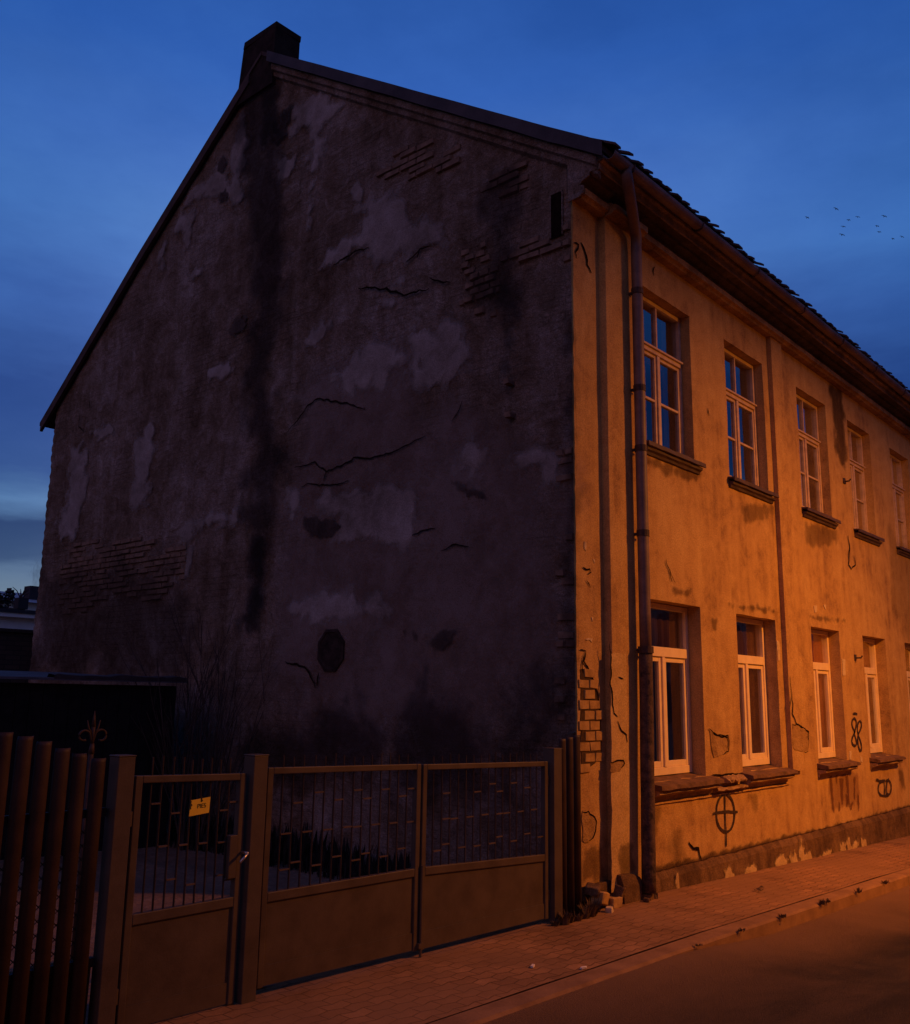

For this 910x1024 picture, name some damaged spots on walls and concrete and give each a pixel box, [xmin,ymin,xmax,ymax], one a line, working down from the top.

crack [574,242,592,273]
crack [358,278,450,296]
crack [288,398,365,431]
crack [294,436,425,487]
crack [285,661,319,686]
flaking render [554,669,625,773]
spalling [709,730,729,758]
spalling [792,724,809,753]
spalling [581,810,597,843]
peeling [775,837,867,866]
peeling [724,864,757,878]